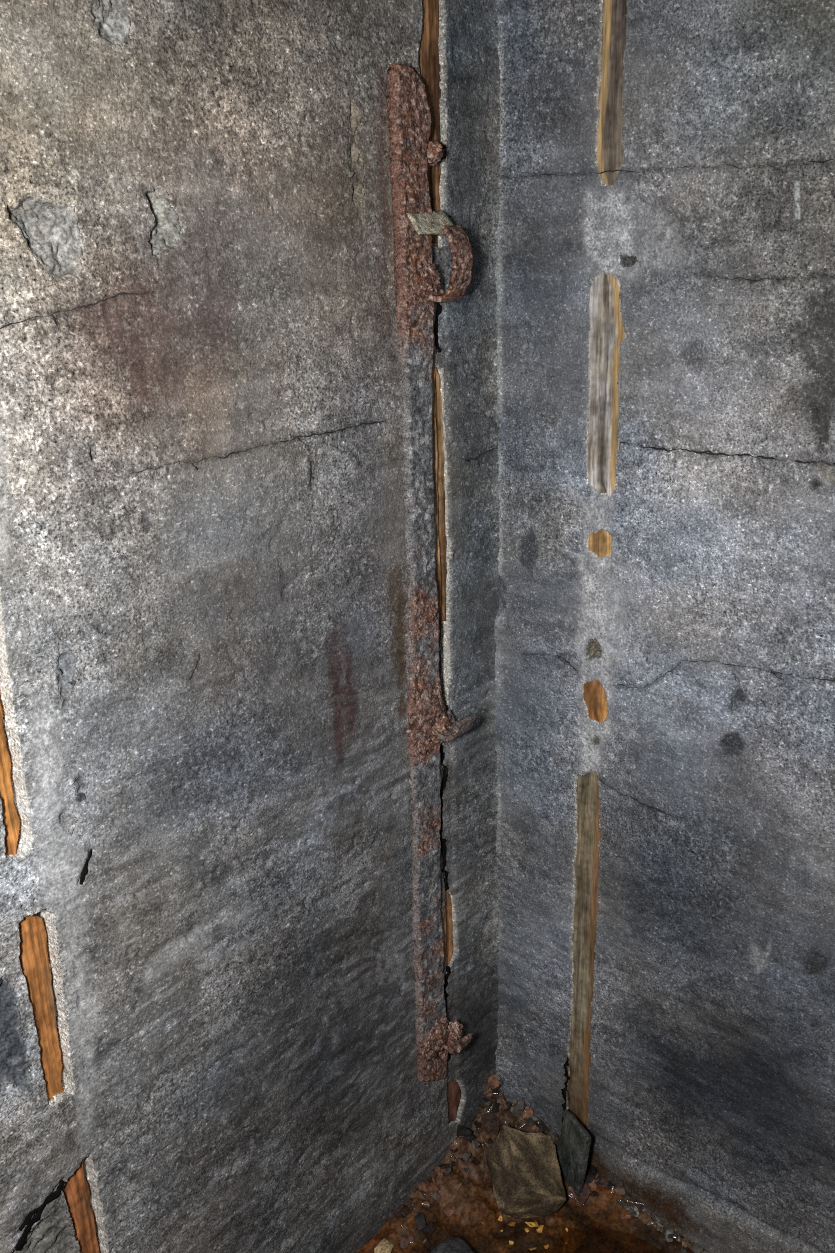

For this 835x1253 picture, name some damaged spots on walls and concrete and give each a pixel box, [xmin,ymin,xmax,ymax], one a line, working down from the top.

spalling [6,194,86,283]
spalling [144,185,183,257]
leakage [798,290,835,451]
crack [130,421,384,485]
crack [620,442,835,475]
crack [440,744,449,891]
crack [443,966,451,1017]
crack [15,1179,65,1251]
corrosion [588,1149,705,1230]